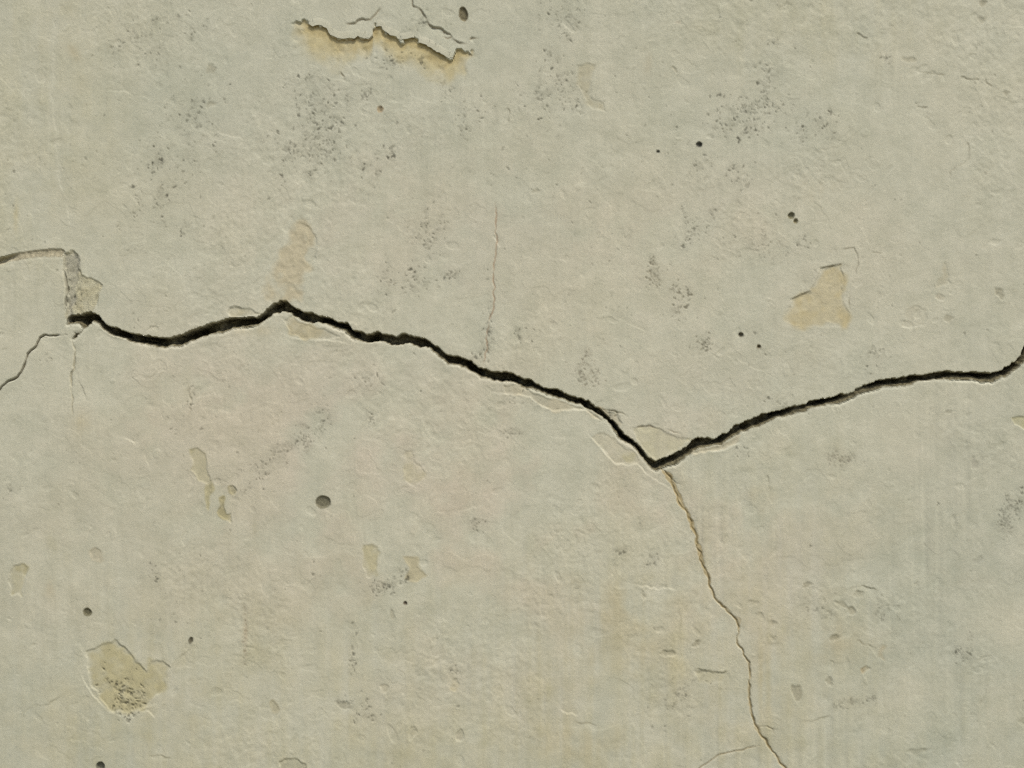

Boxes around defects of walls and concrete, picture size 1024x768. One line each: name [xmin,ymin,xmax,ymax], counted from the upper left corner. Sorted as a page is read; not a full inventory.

peeling [292,0,478,86]
flaking render [62,250,103,319]
peeling [782,264,854,332]
crack [0,206,1024,768]
peeling [87,640,169,723]